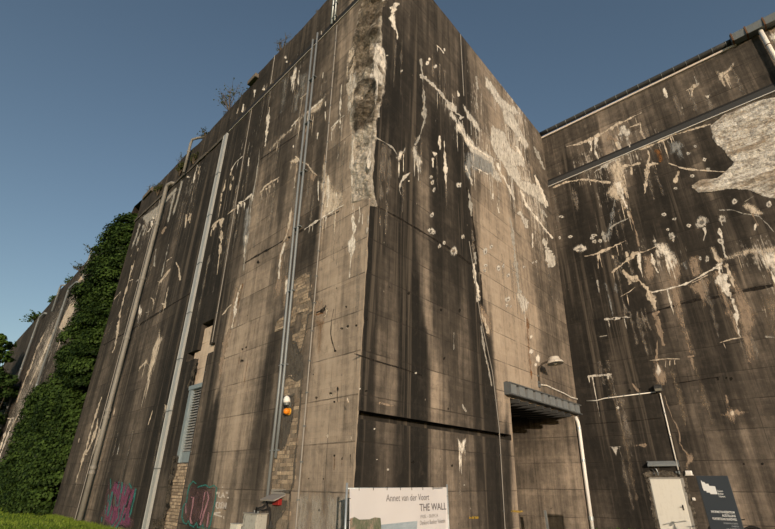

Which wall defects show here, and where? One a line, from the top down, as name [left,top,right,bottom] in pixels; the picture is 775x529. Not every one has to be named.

spalling [346,0,388,208]
efflorescence [374,107,426,193]
efflorescence [432,136,448,188]
peeling [690,94,775,215]
flaking render [275,271,328,353]
water stain [503,218,529,327]
efflorescence [532,233,556,267]
water stain [553,112,775,363]
water stain [75,397,102,487]
spalling [152,455,179,529]
flaking render [271,375,303,529]